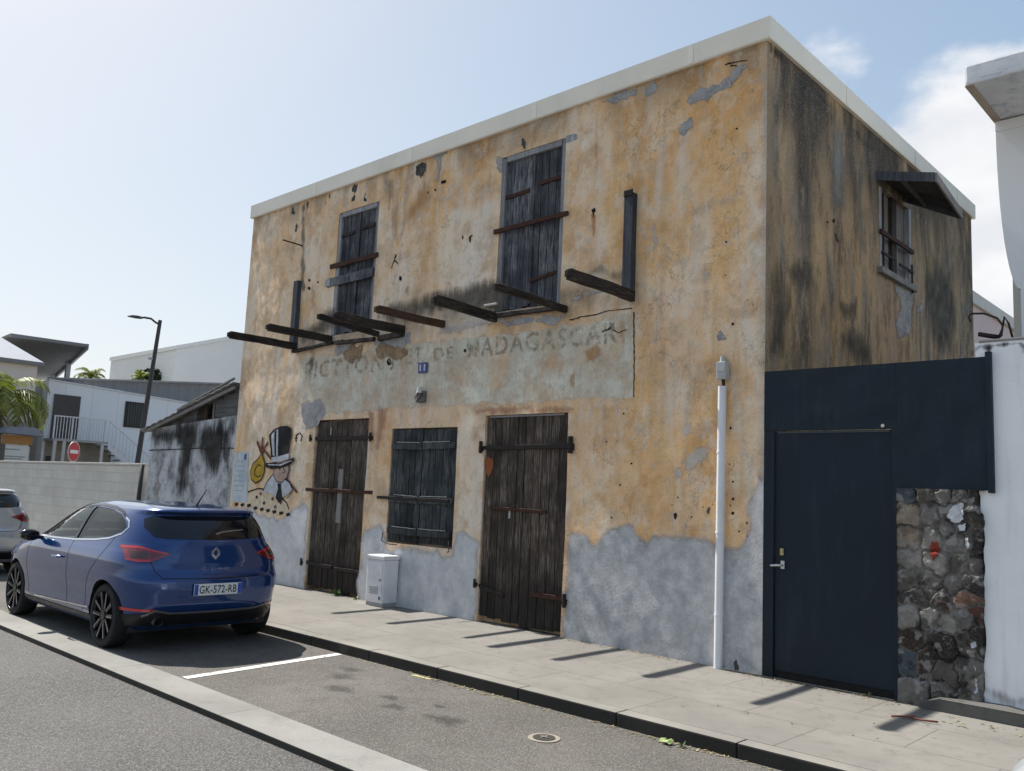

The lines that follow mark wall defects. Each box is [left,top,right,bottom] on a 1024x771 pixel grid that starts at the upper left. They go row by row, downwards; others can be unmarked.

spalling [604,82,657,104]
spalling [679,64,746,136]
damp [386,281,506,323]
damp [774,264,810,349]
spalling [894,278,924,339]
damp [928,267,954,352]
spalling [335,332,411,363]
spalling [301,399,325,429]
damp [154,421,234,494]